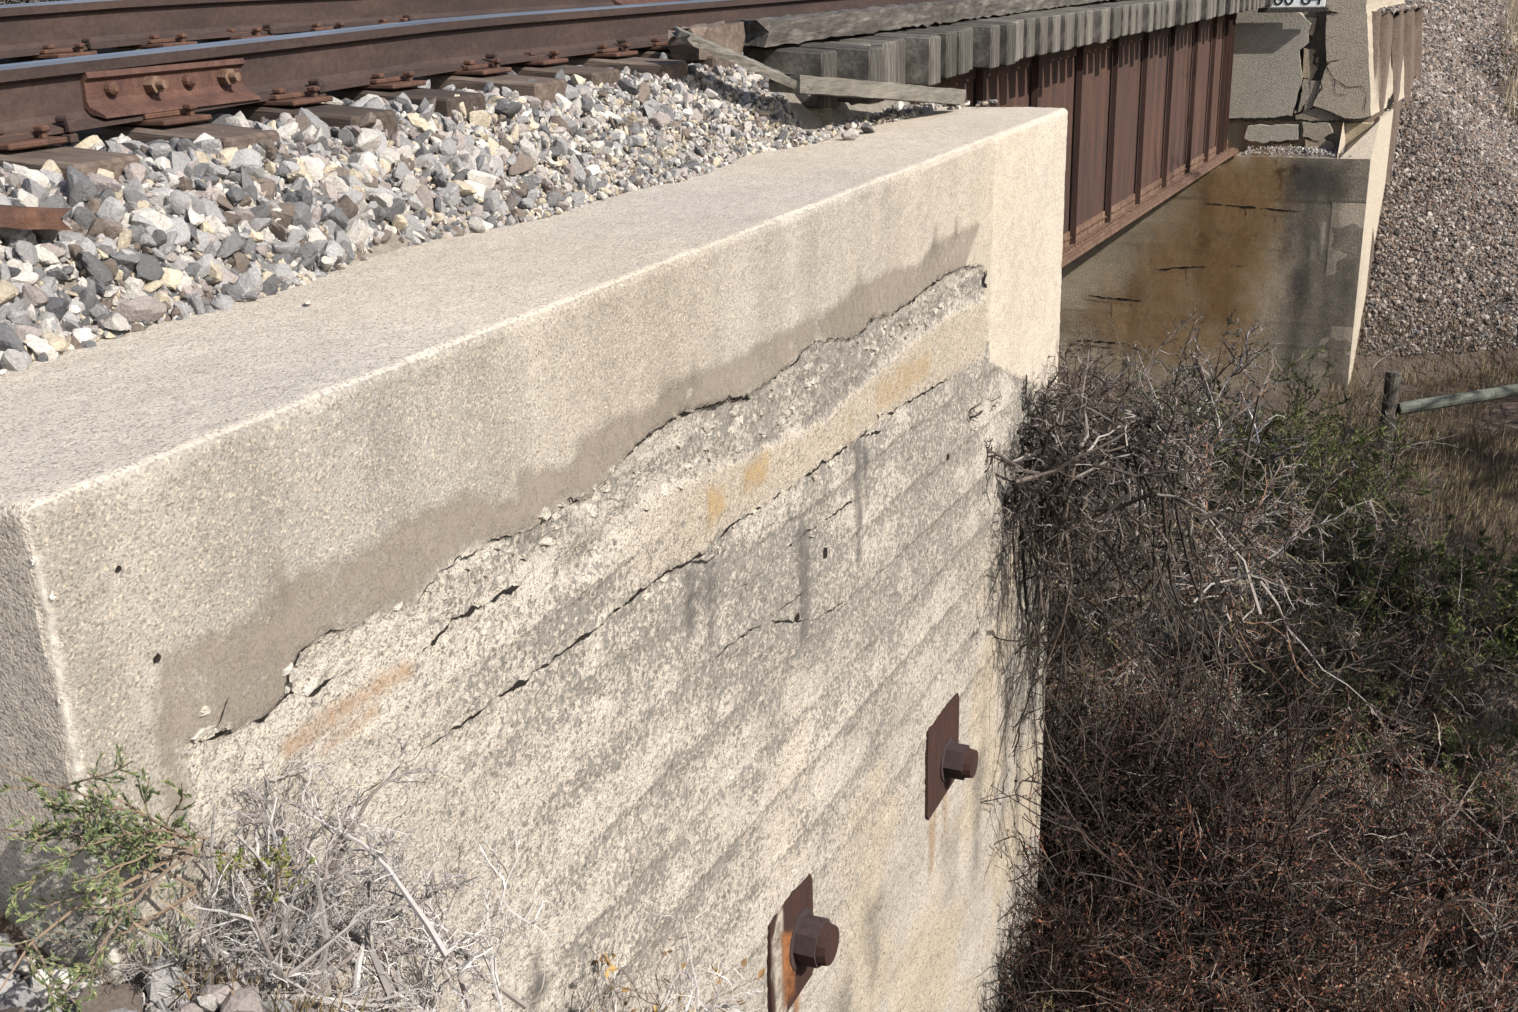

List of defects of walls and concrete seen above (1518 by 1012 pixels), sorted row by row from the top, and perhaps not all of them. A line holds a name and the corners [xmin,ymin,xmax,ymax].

crack [1229,10,1394,123]
spalling [857,273,970,360]
water stain [161,225,979,807]
crack [207,251,987,740]
spalling [465,362,827,577]
spalling [812,446,842,481]
crack [325,379,947,861]
spalling [191,705,234,743]
spalling [276,652,321,705]
rust [782,933,799,1012]